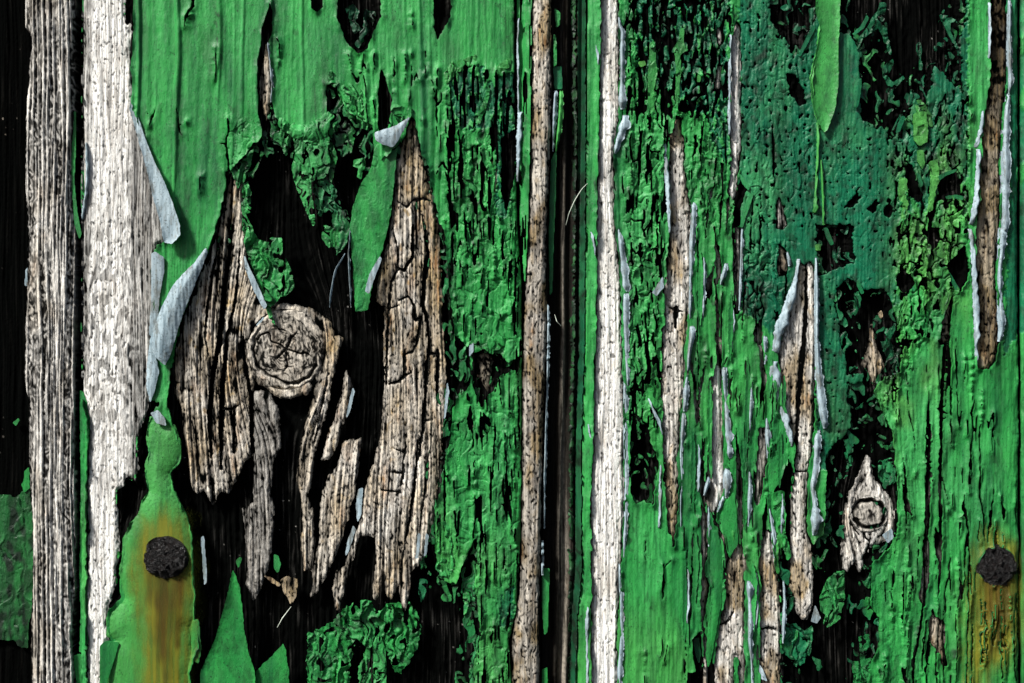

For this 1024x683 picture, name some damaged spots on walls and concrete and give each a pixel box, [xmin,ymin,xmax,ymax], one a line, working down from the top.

peeling [463,161,479,193]
peeling [844,0,1014,369]
peeling [71,0,449,683]
crack [380,52,454,567]
peeling [496,0,657,683]
peeling [648,23,834,683]
peeling [861,323,896,385]
corrosion [142,515,191,683]
peeling [859,634,870,660]
peeling [840,438,895,572]
corrosion [971,576,1017,683]
corrosion [981,532,1016,561]